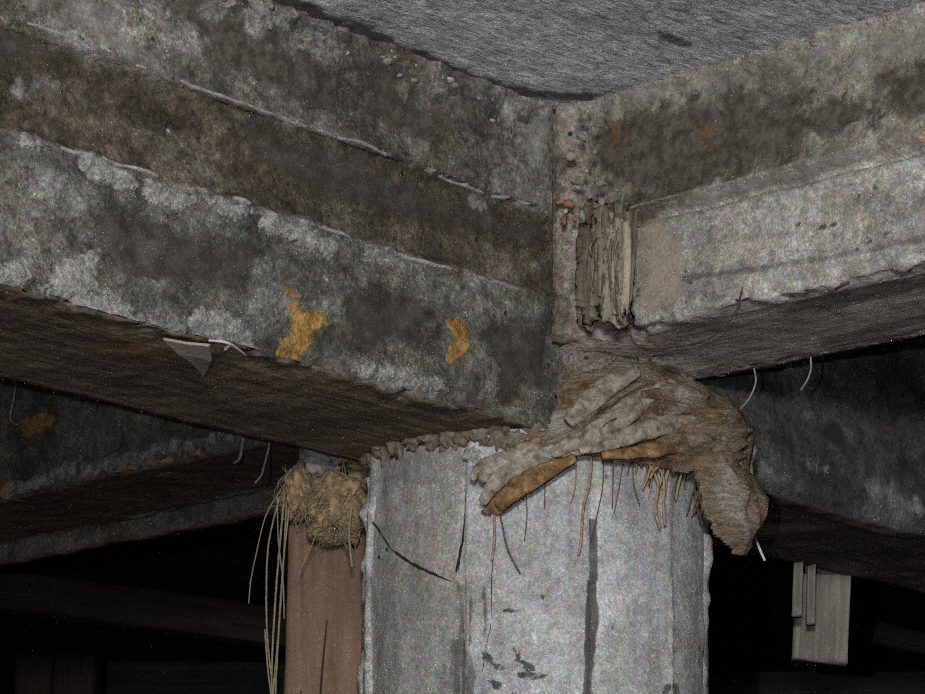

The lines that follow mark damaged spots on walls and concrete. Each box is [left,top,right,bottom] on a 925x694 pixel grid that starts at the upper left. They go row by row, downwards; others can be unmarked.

water stain [62,0,160,80]
water stain [181,3,344,121]
water stain [272,0,611,140]
water stain [523,124,550,168]
water stain [590,54,925,223]
water stain [469,194,486,211]
water stain [103,205,255,291]
rust [276,283,328,363]
crack [372,493,466,581]